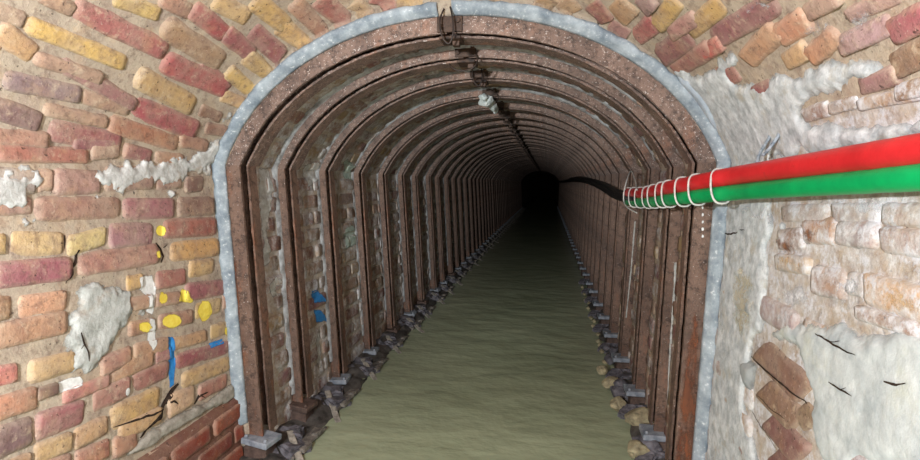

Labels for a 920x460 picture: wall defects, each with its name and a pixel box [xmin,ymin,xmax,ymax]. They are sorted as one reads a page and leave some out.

crack [64,235,80,283]
crack [81,332,90,361]
crack [815,334,854,355]
crack [751,356,807,404]
crack [113,383,208,438]